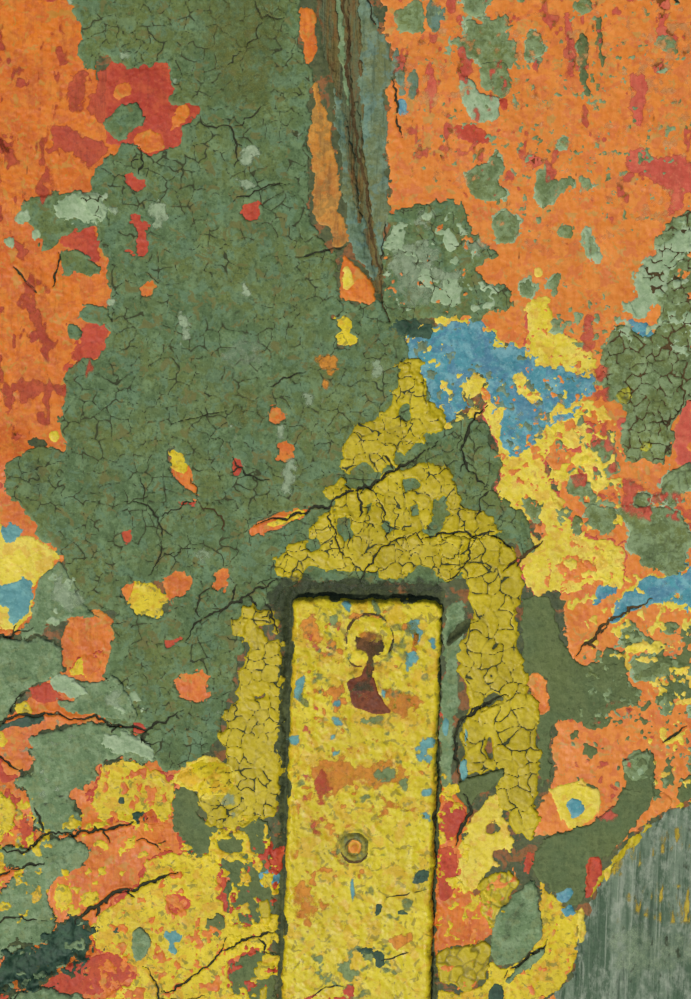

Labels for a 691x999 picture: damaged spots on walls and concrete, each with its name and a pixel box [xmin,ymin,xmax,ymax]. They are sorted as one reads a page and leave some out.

crack [604,212,691,465]
crack [0,0,543,845]
spalling [400,588,446,604]
peeling [376,620,436,672]
peeling [412,738,435,767]
crack [0,808,166,876]
crack [0,915,42,923]
crack [74,872,178,925]
peeling [350,869,413,921]
peeling [486,873,508,891]
peeling [636,885,690,923]
crack [142,930,279,999]